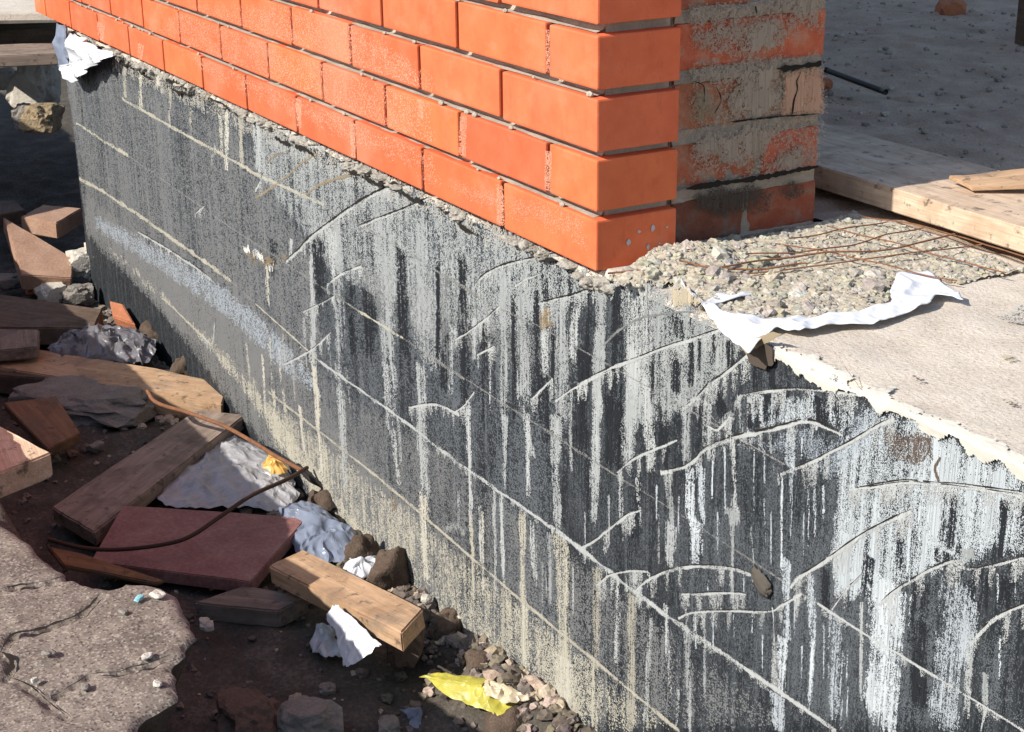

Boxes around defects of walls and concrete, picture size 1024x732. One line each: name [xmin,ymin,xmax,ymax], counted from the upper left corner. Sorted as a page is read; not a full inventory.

crack [694,60,825,123]
crack [79,177,238,288]
crack [76,123,248,238]
efflorescence [454,182,588,251]
crack [122,97,1024,732]
spalling [741,332,1024,482]
leakage [294,475,316,499]
crack [1,595,171,715]
leakage [763,690,791,732]
leakage [974,609,1024,731]